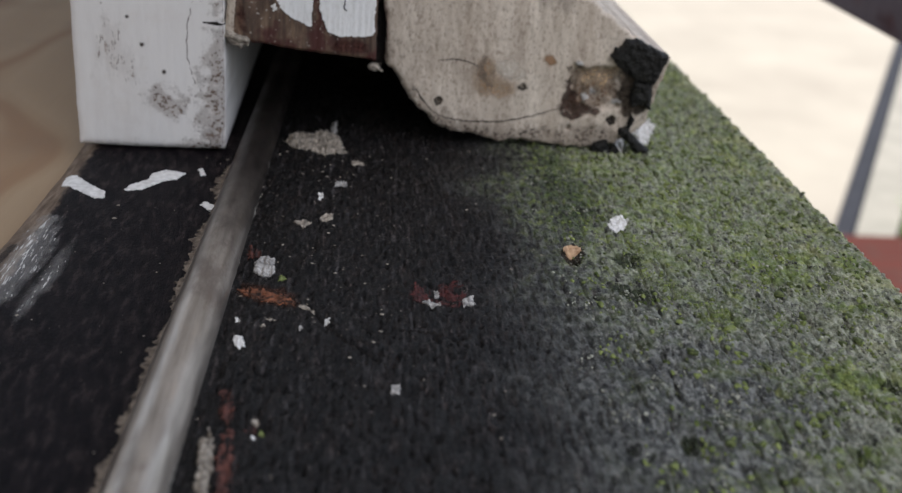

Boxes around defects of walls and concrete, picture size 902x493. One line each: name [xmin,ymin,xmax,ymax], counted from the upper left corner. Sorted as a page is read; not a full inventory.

peeling [271,0,377,37]
crack [186,1,225,91]
water stain [616,73,646,118]
peeling [62,175,105,199]
peeling [124,170,186,191]
rust [236,284,296,306]